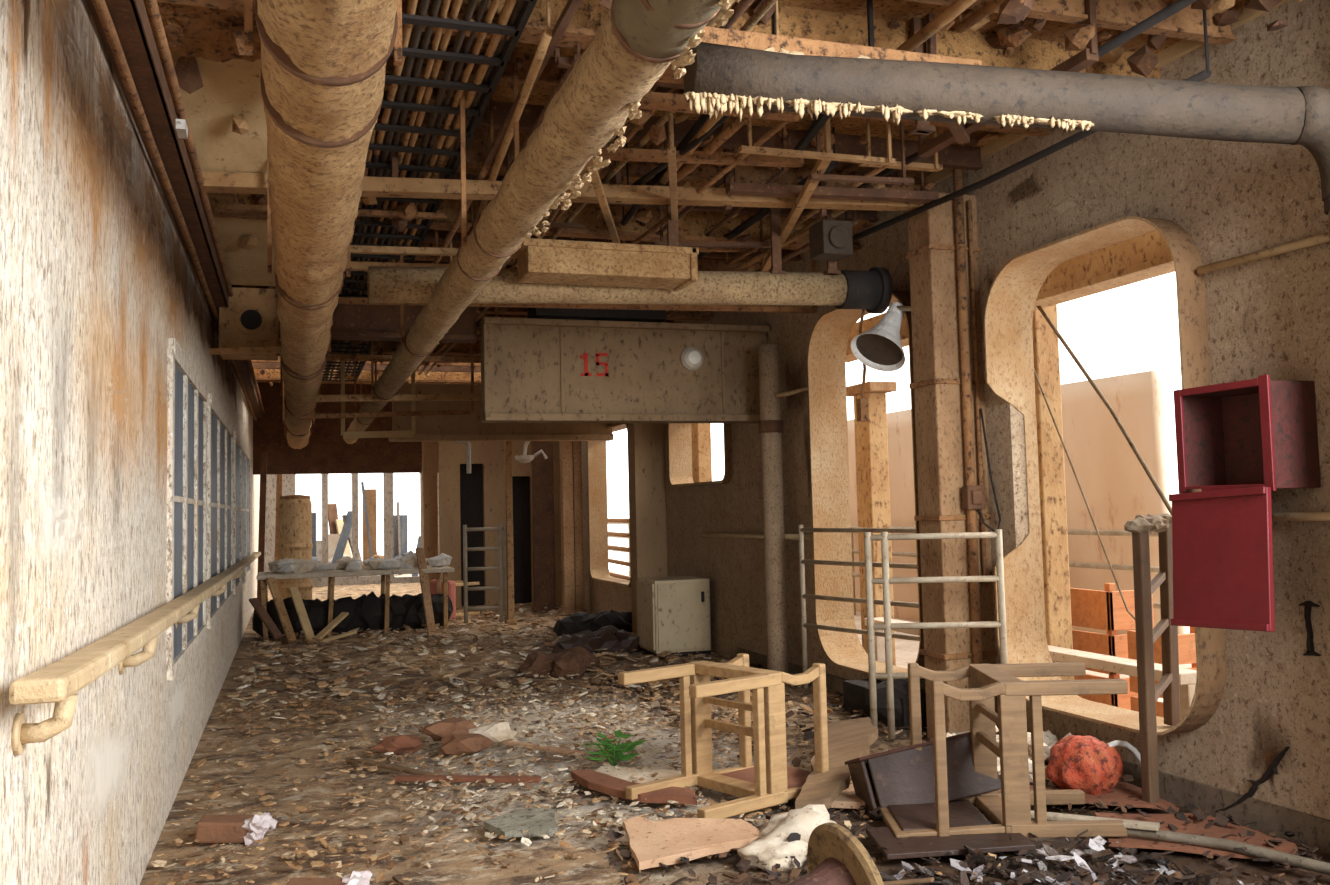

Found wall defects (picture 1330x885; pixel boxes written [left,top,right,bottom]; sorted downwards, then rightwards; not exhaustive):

corrosion [12,0,30,71]
peeling [670,0,1094,131]
water stain [38,0,236,404]
peeling [523,101,642,240]
peeling [1009,174,1041,203]
corrosion [159,401,168,447]